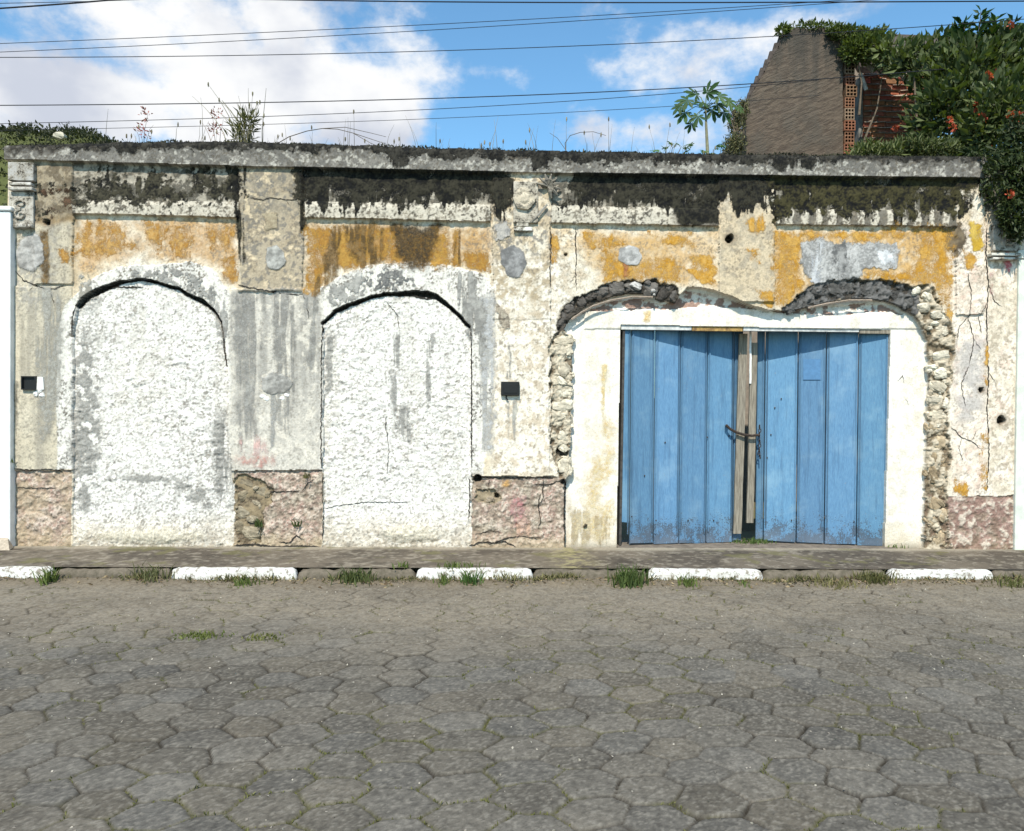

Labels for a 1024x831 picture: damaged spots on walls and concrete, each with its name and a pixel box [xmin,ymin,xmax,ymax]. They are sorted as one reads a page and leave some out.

leakage [18,141,994,232]
spalling [233,474,274,544]
leakage [108,223,442,508]
crack [234,285,566,547]
spalling [548,230,718,484]
spalling [746,214,985,549]
crack [952,229,1001,491]